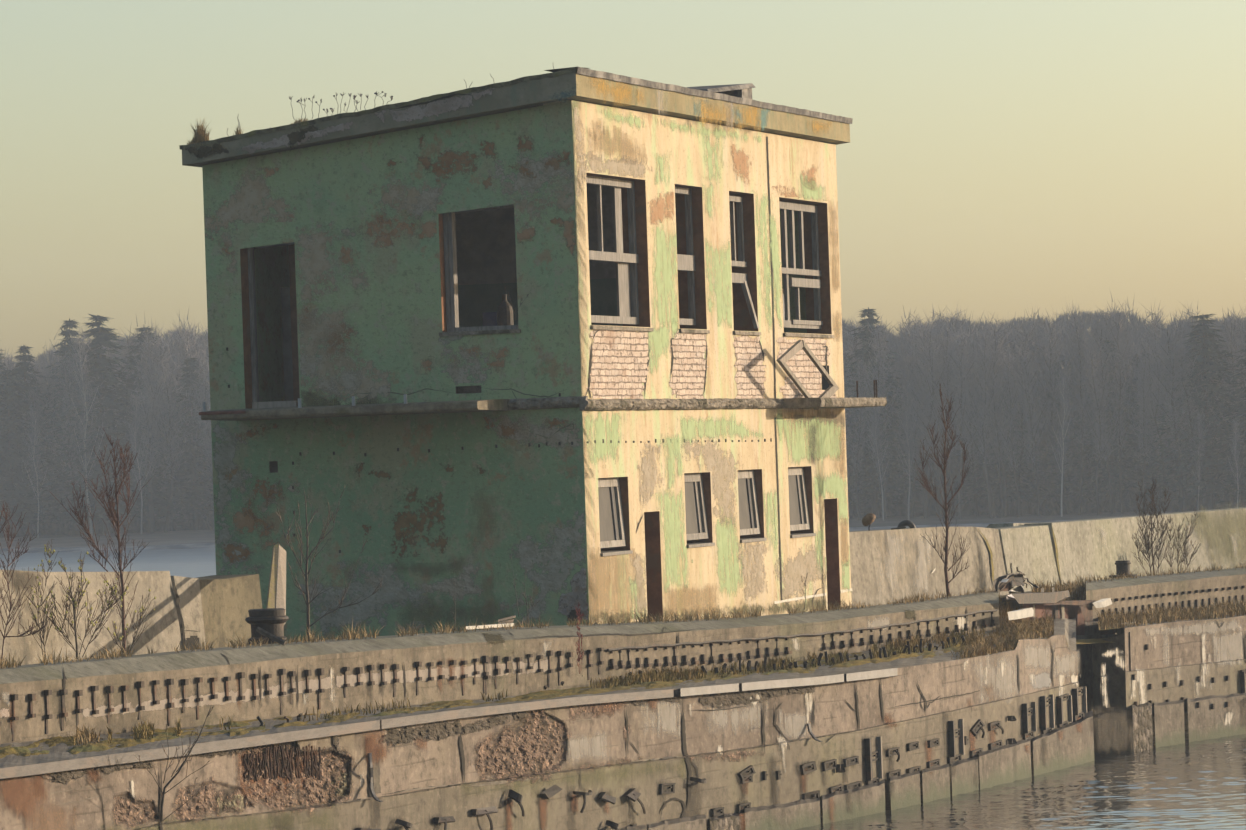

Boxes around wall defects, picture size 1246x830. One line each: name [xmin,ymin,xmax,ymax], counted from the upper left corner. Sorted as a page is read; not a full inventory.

spalling [204,121,353,154]
spalling [375,88,495,123]
peeling [204,167,295,274]
spalling [507,107,709,463]
spalling [706,167,837,399]
spalling [456,385,481,394]
peeling [356,463,448,562]
flaking render [499,511,589,624]
corrosion [2,775,46,818]